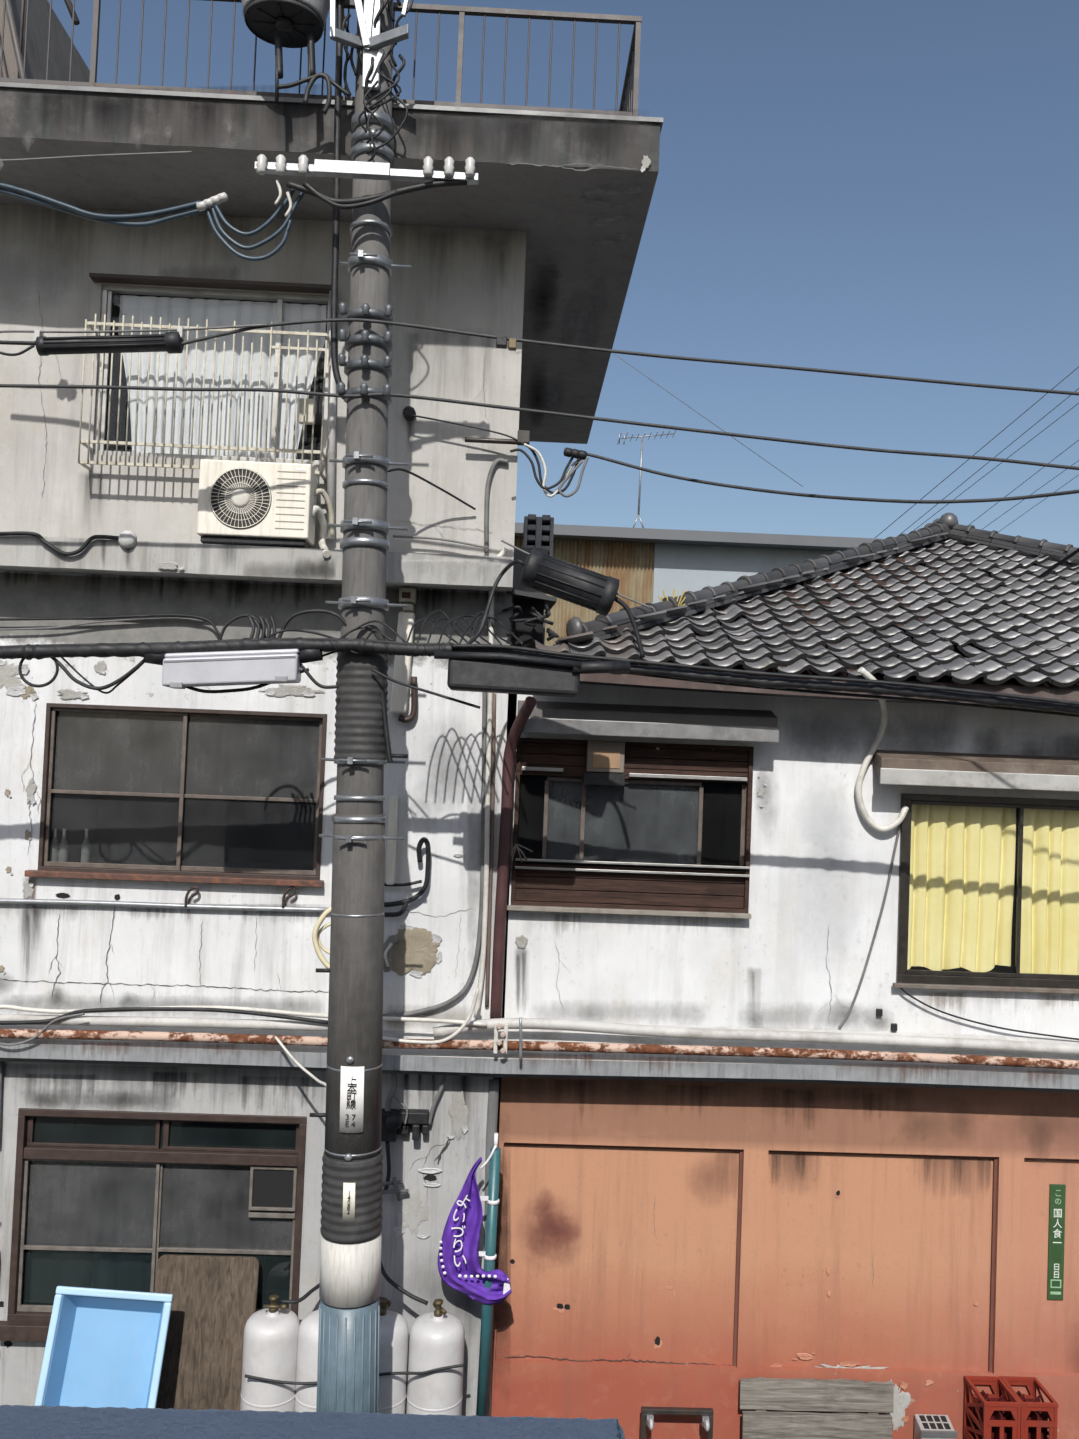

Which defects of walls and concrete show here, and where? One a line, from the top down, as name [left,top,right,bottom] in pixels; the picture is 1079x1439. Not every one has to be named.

peeling [0,659,39,701]
crack [3,907,323,1001]
spalling [387,924,442,978]